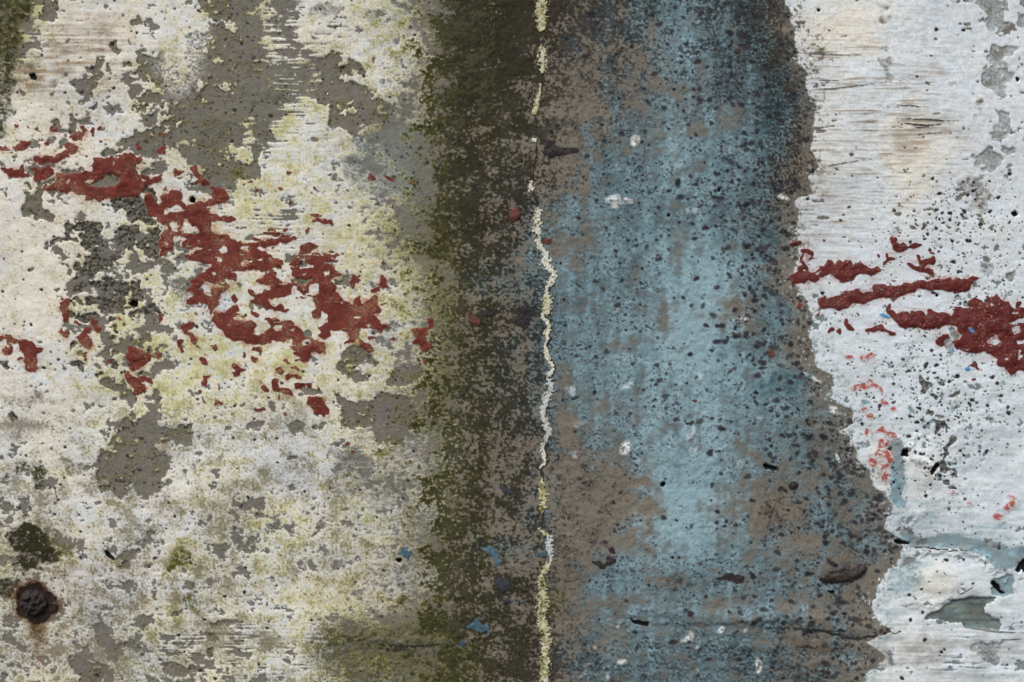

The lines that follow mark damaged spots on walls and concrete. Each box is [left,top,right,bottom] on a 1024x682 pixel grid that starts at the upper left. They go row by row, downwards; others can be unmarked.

corrosion [7,575,67,672]
peeling [0,0,434,500]
crack [528,0,558,682]
peeling [542,0,1024,610]